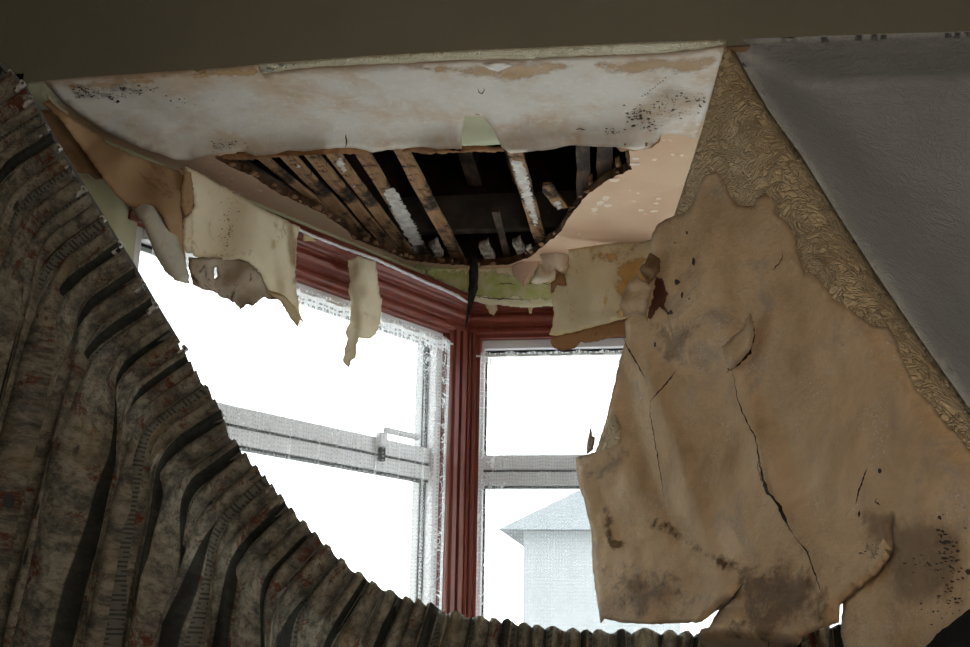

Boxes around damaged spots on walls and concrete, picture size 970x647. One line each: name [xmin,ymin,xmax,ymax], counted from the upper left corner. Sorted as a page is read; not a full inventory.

water stain [598,58,714,134]
peeling [525,190,589,284]
crack [732,370,821,591]
water stain [903,514,970,625]